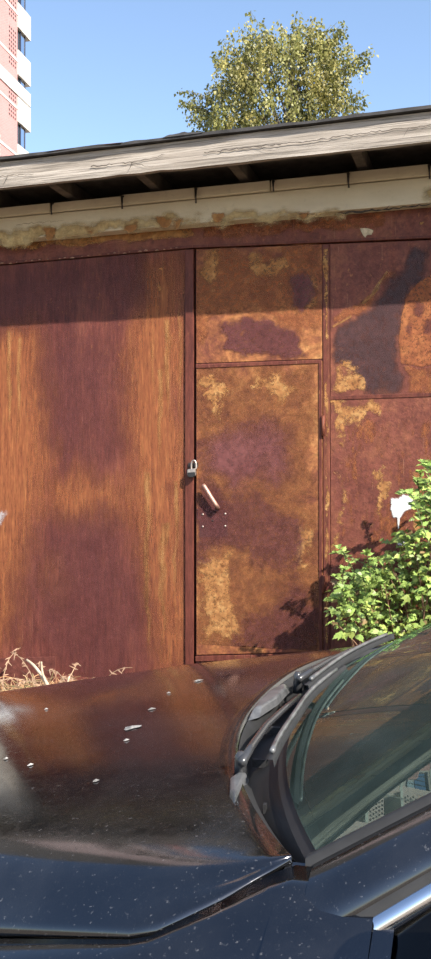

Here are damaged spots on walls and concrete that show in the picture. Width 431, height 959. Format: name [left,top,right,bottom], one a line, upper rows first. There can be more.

corrosion [0,209,385,666]
corrosion [324,362,424,581]
corrosion [399,275,431,393]